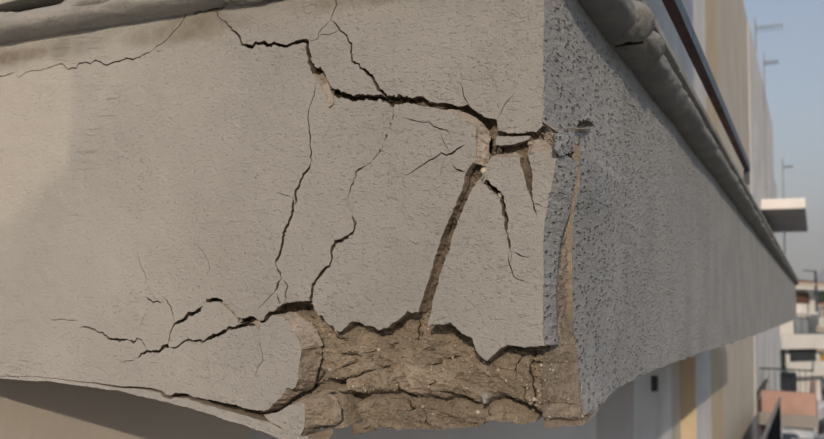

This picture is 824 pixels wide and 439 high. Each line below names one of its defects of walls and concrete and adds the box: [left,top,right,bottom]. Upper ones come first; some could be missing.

crack [194,0,542,312]
crack [58,298,266,362]
crack [125,386,281,417]
spalling [0,301,599,439]
crack [557,225,569,338]